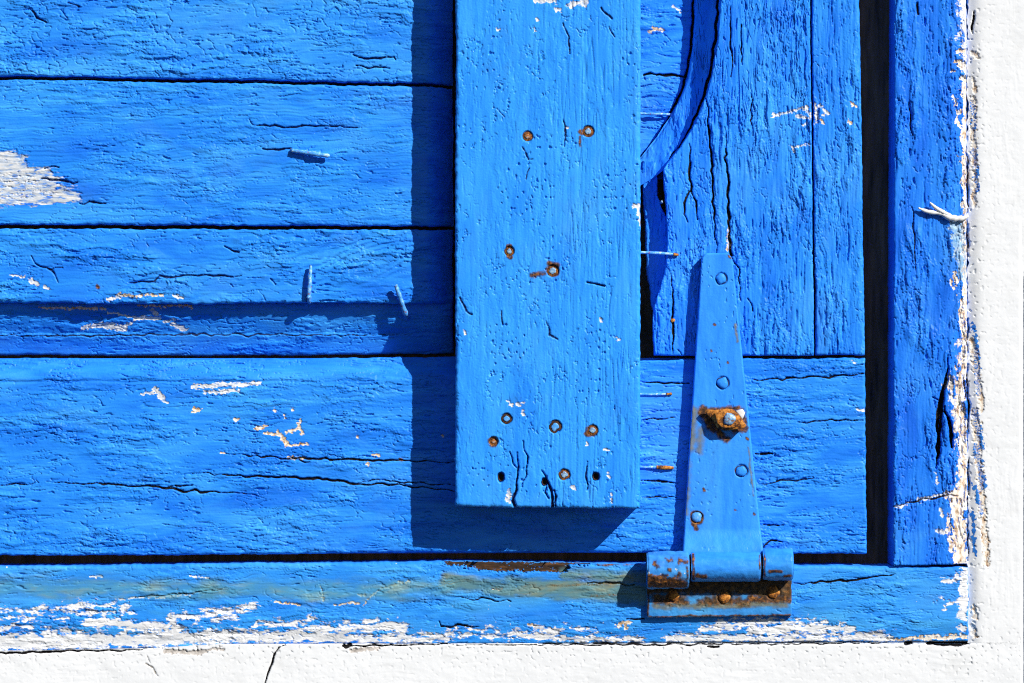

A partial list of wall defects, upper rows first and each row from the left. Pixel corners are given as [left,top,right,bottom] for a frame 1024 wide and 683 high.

peeling [0,151,82,207]
crack [640,0,753,312]
rust [530,261,560,278]
peeling [38,292,193,332]
peeling [661,0,991,642]
peeling [191,381,261,395]
crack [1,453,455,494]
rust [689,405,753,485]
crack [893,326,970,507]
rust [647,553,792,618]
peeling [0,588,646,656]
crack [265,644,286,683]